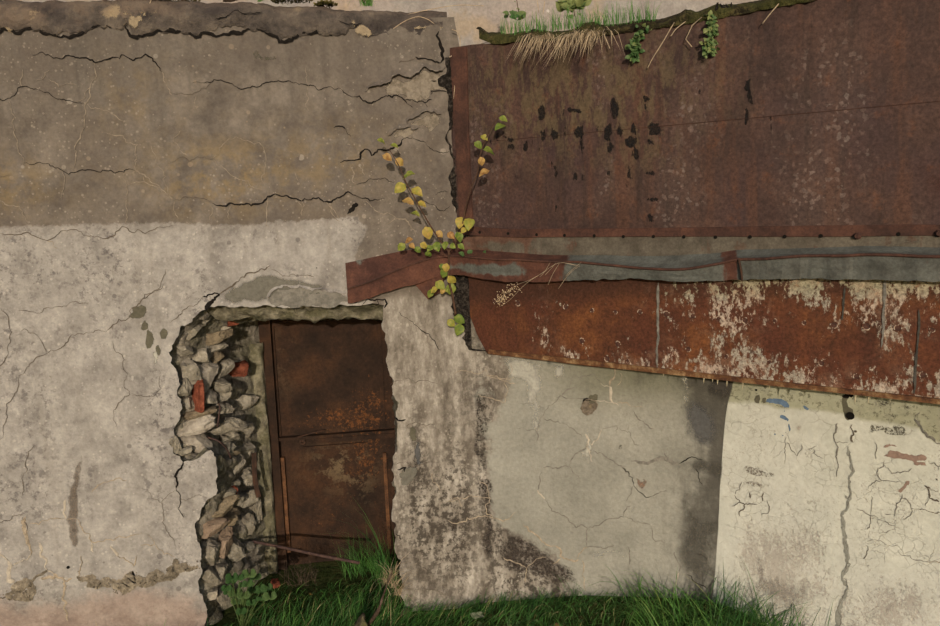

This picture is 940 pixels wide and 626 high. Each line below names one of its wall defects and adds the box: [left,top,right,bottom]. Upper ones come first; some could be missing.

crack [0,10,447,249]
flaking render [364,62,446,138]
crack [170,266,313,323]
spalling [225,276,348,308]
crack [0,273,166,434]
damp [688,404,714,444]
damp [709,379,730,397]
damp [475,395,574,581]
crack [392,366,707,591]
damp [683,518,713,576]
damp [693,461,722,477]
crack [784,413,940,626]